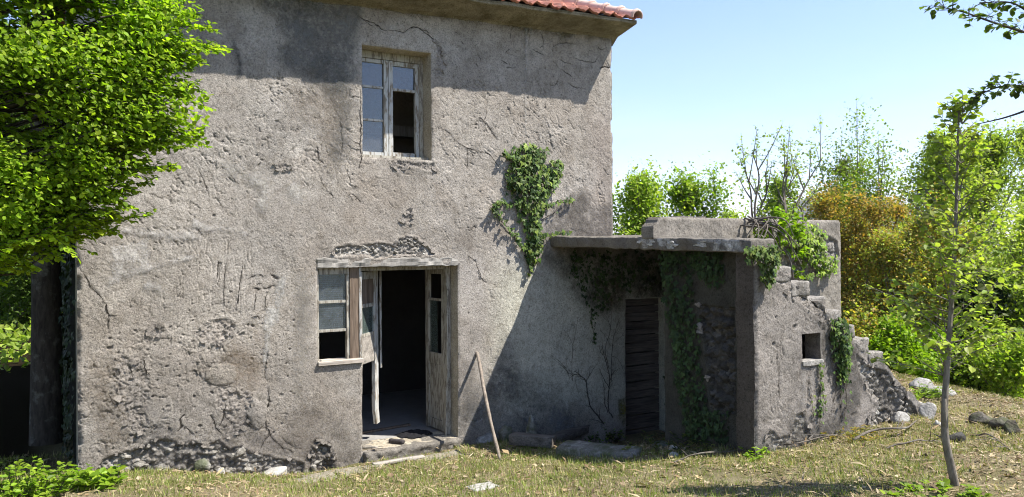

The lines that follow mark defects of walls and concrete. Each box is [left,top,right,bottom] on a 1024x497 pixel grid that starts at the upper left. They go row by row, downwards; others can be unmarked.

crack [360,16,511,68]
crack [536,34,610,89]
spalling [331,237,436,258]
crack [80,269,117,329]
crack [217,262,300,450]
crack [150,406,232,433]
spalling [98,356,336,474]
spalling [856,357,917,425]